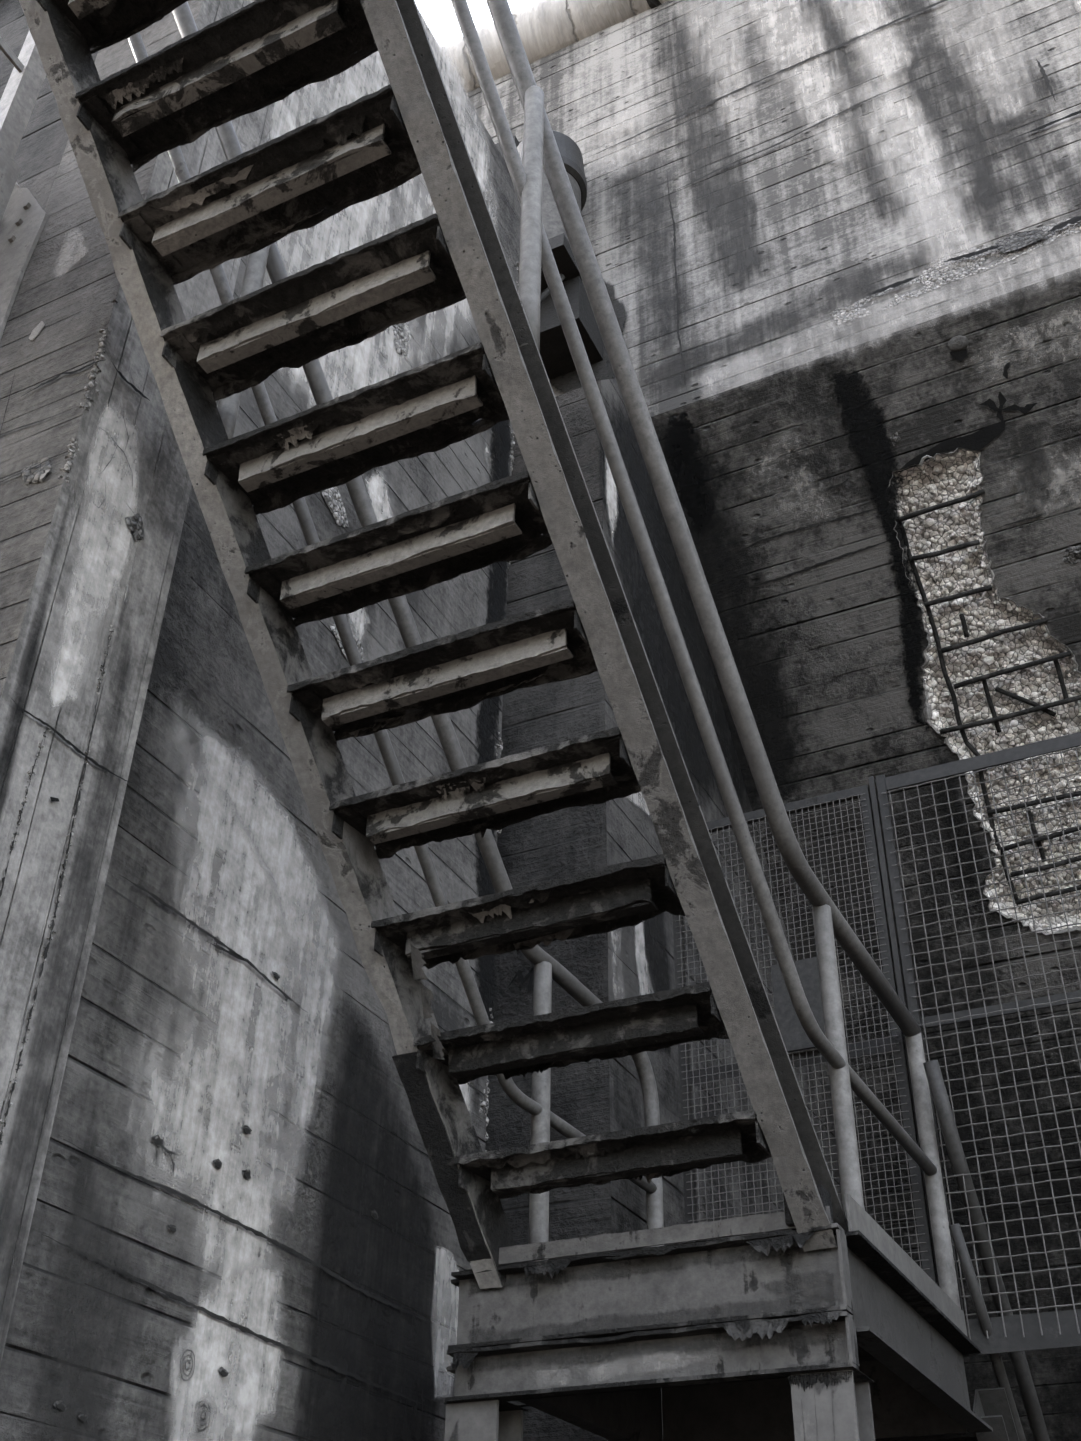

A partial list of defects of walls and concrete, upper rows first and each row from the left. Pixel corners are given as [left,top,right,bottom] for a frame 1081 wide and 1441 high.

damp [657,3,769,288]
damp [750,0,1056,258]
damp [831,370,929,730]
spalling [888,448,1081,935]